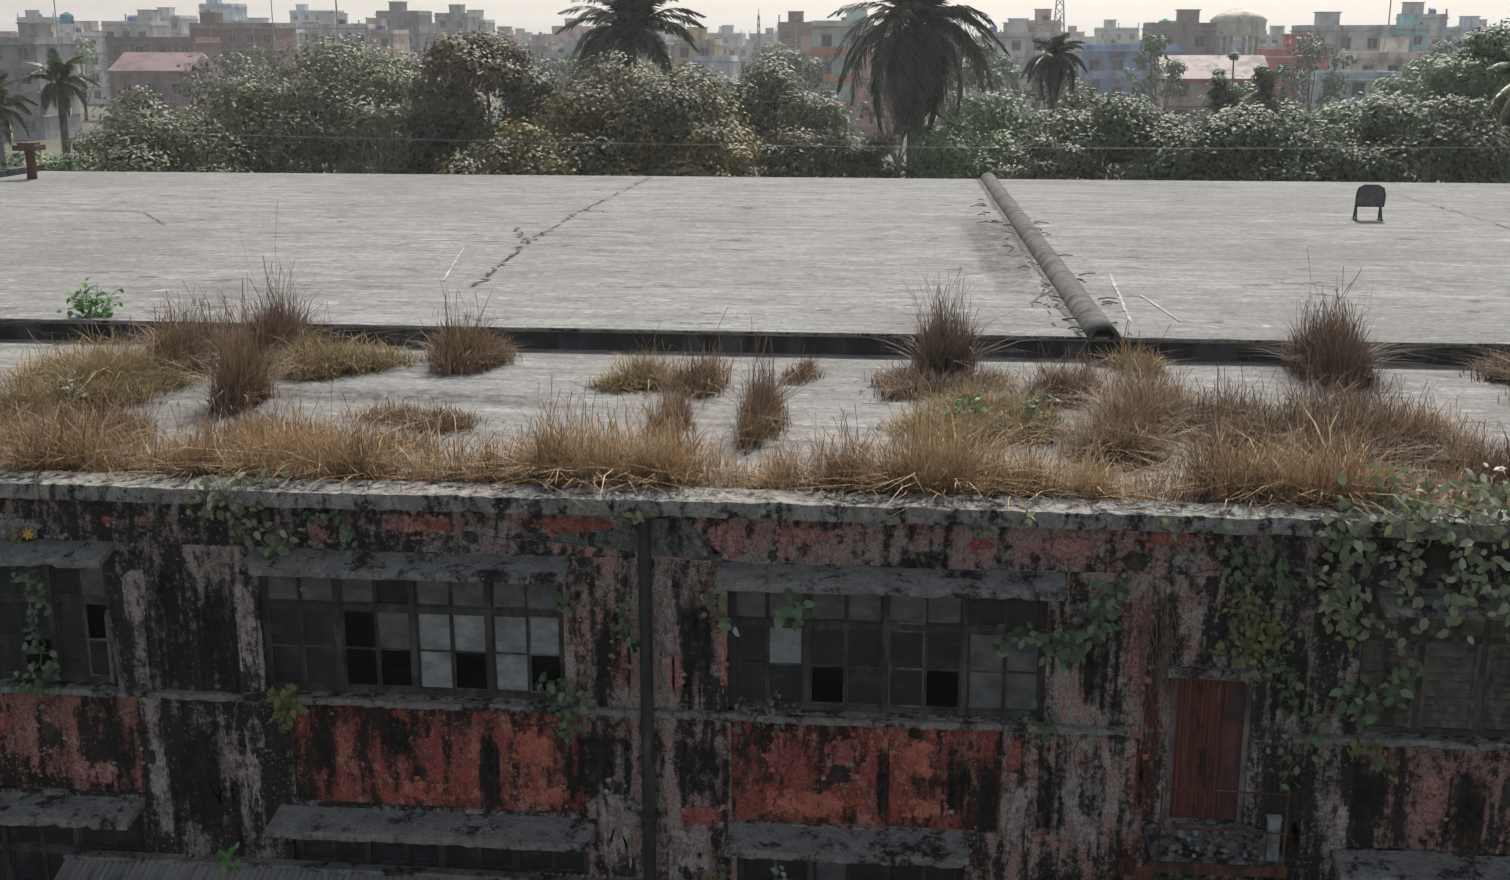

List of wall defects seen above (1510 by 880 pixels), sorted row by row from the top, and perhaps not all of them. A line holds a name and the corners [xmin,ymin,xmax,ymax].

crack [471,178,650,286]
peeling [694,523,847,564]
peeling [35,718,119,785]
water stain [98,561,265,856]
peeling [378,776,479,803]
peeling [511,719,575,811]
peeling [675,732,869,831]
peeling [889,737,954,823]
water stain [941,747,1098,859]
spalling [1495,779,1510,817]